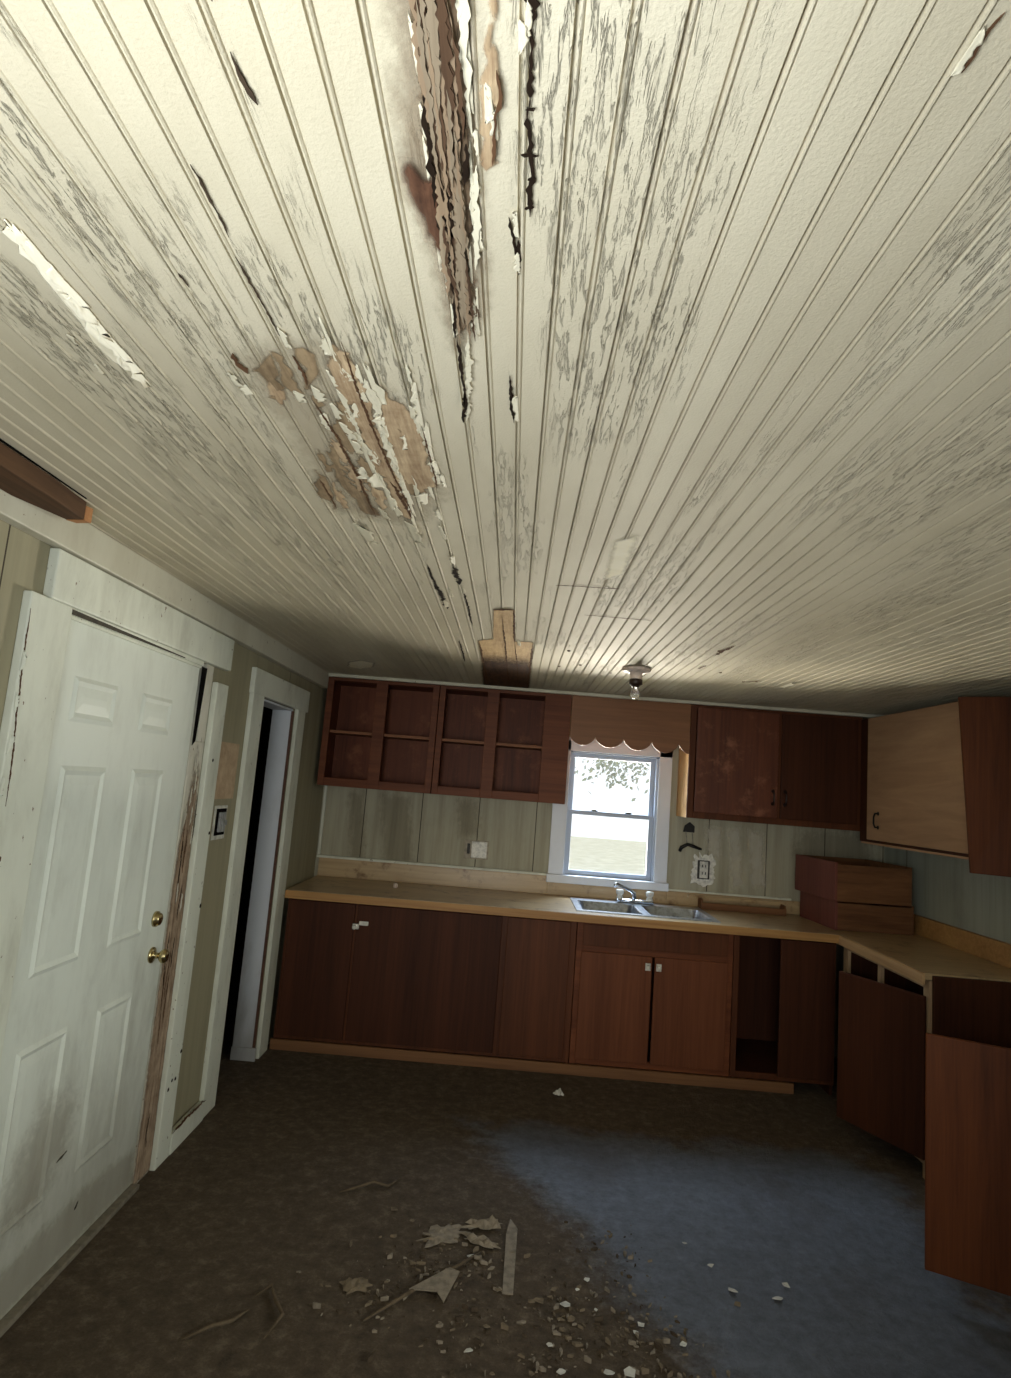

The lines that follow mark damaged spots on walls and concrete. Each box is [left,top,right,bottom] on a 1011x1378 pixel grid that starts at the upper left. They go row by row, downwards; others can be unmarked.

crack [230,51,258,105]
peeling [403,0,503,423]
crack [508,0,540,275]
peeling [949,12,1005,78]
peeling [227,314,449,544]
peeling [427,556,533,692]